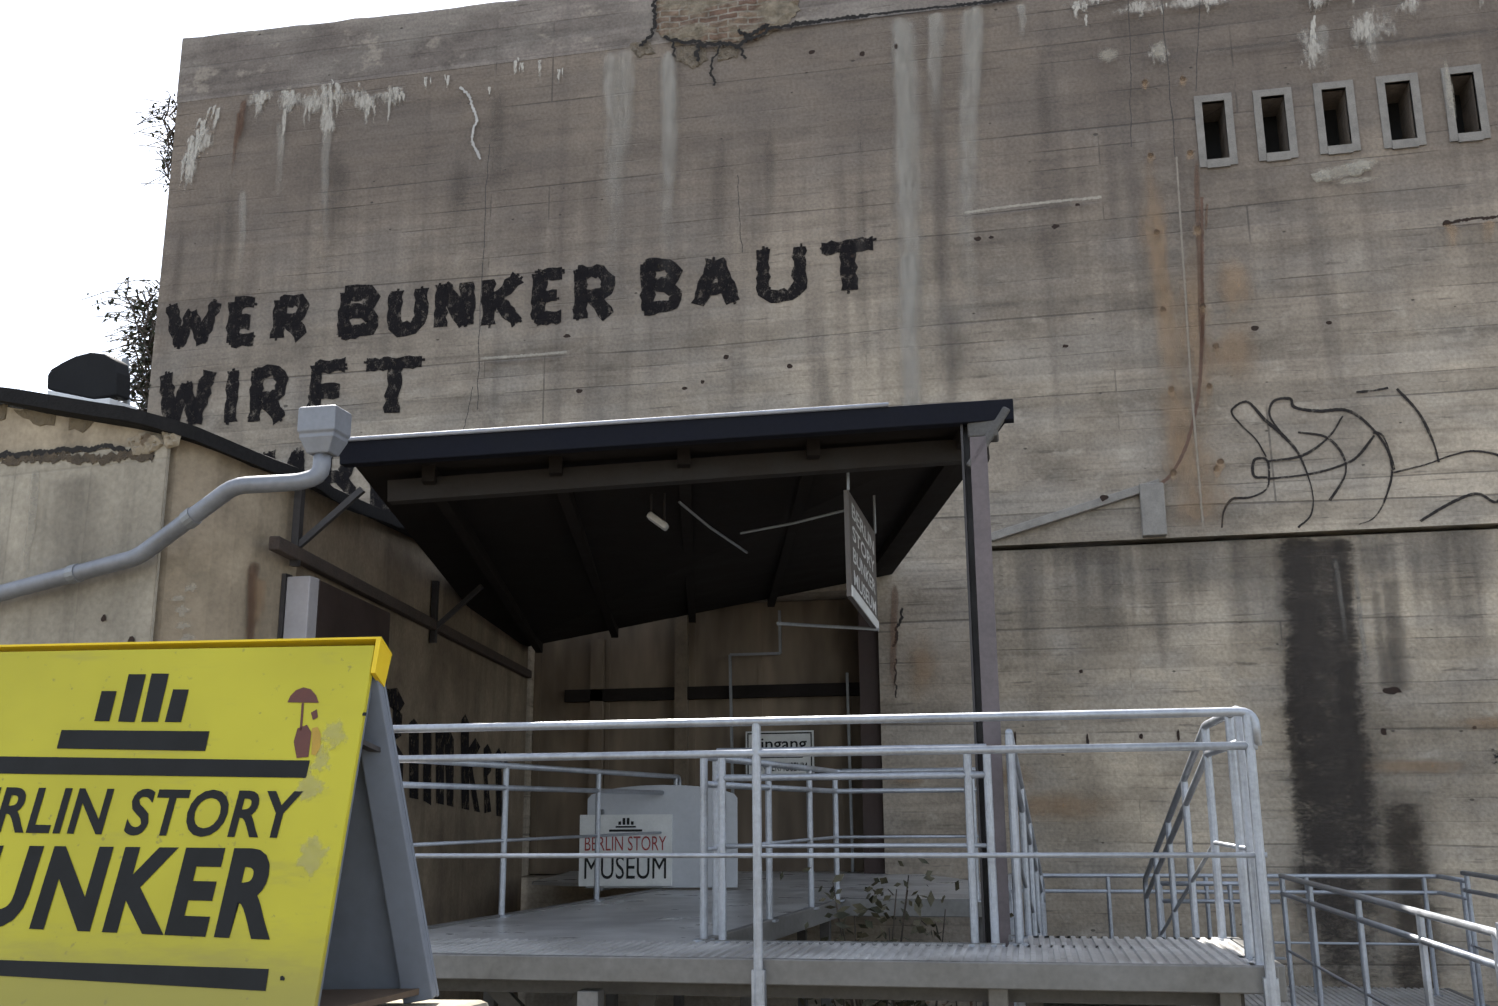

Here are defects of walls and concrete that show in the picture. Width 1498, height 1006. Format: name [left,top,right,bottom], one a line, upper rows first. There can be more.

spalling [629,0,801,69]
water stain [1072,0,1099,25]
water stain [1129,0,1225,15]
water stain [1304,0,1322,64]
water stain [1352,0,1482,44]
water stain [514,58,563,79]
water stain [181,105,220,182]
water stain [250,79,405,139]
water stain [424,75,491,159]
corrosion [1160,166,1211,484]
water stain [1284,539,1433,989]